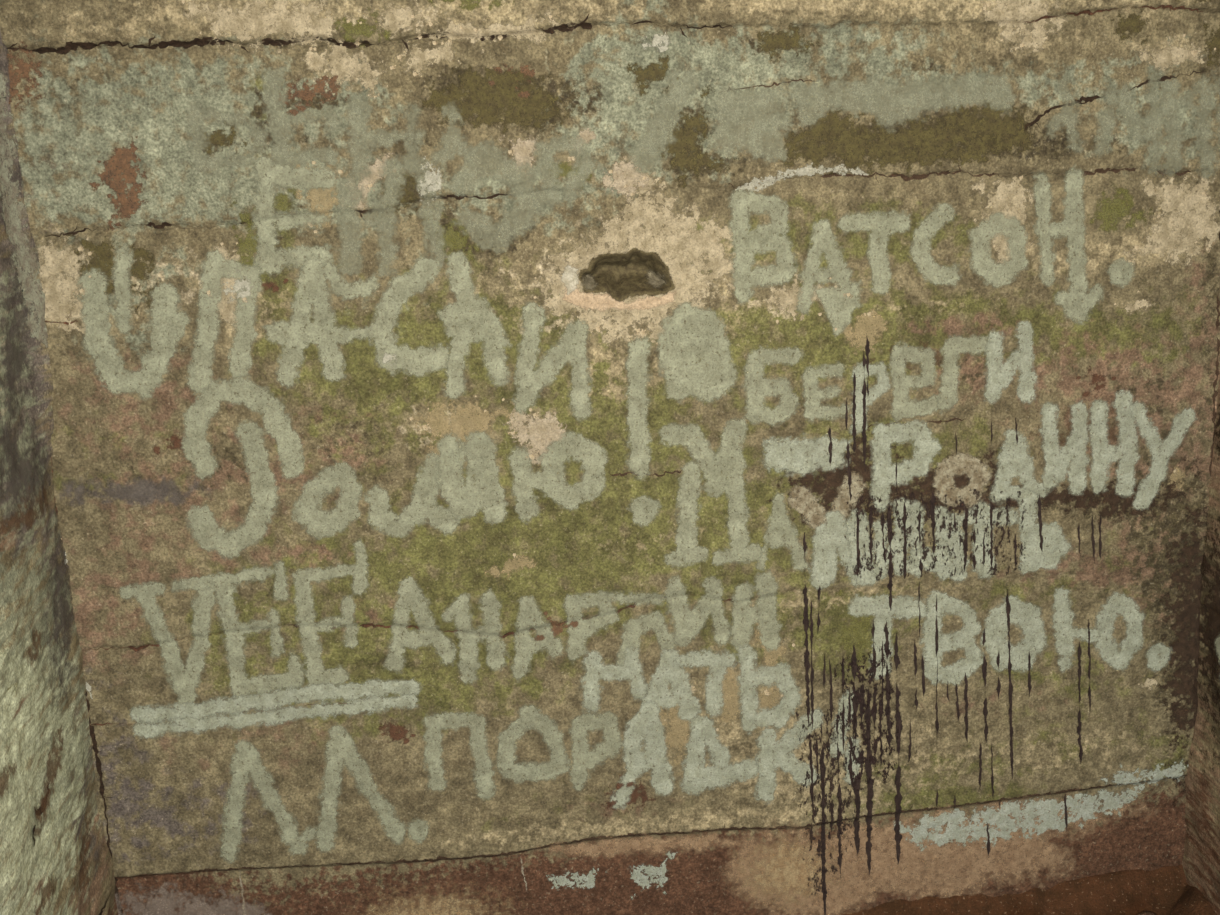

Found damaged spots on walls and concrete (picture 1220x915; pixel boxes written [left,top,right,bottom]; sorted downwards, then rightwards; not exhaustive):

crack [6,14,732,55]
crack [1022,5,1203,23]
crack [1024,71,1204,130]
corrosion [89,136,148,231]
crack [728,167,1191,188]
spalling [533,155,736,346]
crack [1209,287,1220,475]
leakage [769,338,1220,915]